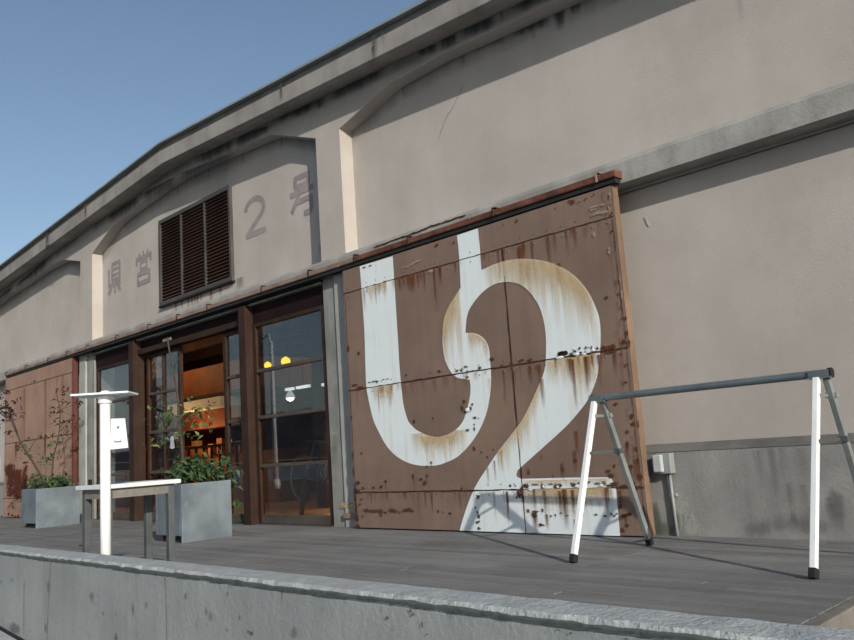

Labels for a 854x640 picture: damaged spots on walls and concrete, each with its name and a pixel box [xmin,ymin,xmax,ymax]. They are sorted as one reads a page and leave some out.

corrosion [484,226,589,299]
corrosion [443,291,460,336]
corrosion [352,384,393,400]
corrosion [473,307,631,470]
corrosion [413,420,459,444]
corrosion [1,461,36,518]
corrosion [342,451,388,528]
corrosion [506,413,643,532]